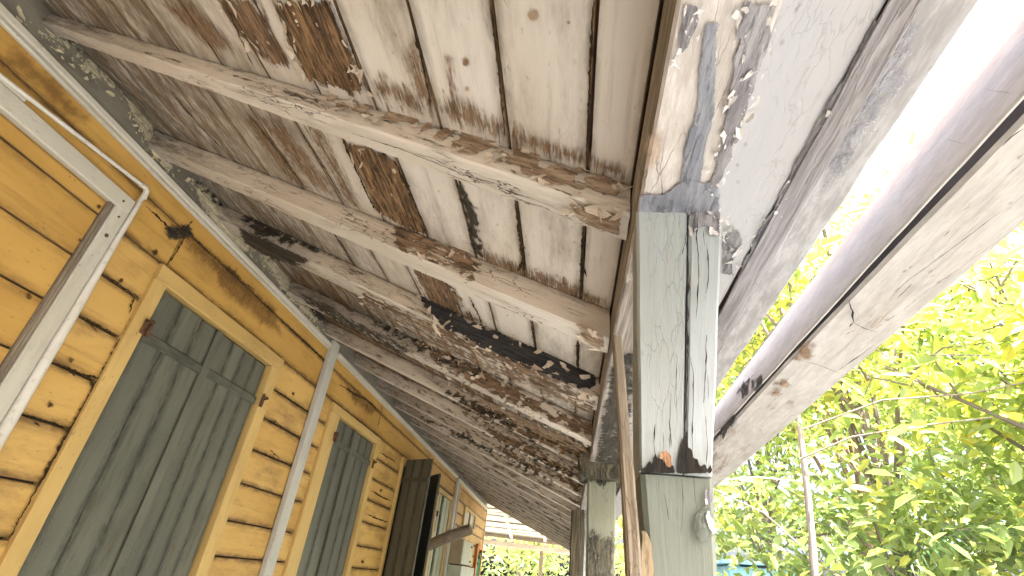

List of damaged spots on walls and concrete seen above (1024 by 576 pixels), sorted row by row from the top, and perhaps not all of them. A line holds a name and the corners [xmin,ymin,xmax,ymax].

peeling [16,5,326,332]
crack [147,207,324,360]
peeling [215,0,633,228]
peeling [342,141,600,497]
peeling [576,328,605,354]
crack [654,211,709,527]
peeling [671,5,708,69]
peeling [688,1,877,282]